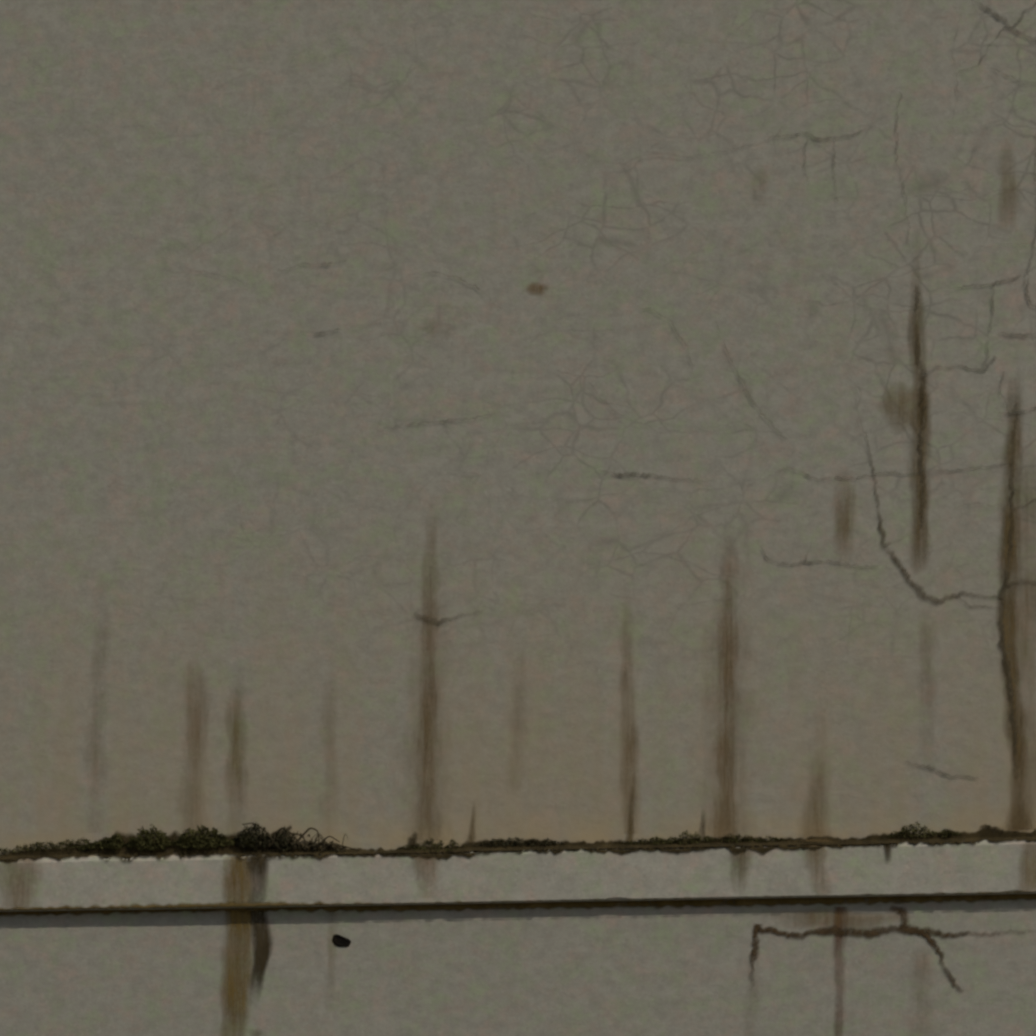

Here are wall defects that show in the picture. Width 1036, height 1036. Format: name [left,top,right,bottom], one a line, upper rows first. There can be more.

damp [913,313,928,554]
crack [916,342,926,479]
crack [878,518,955,603]
crack [1000,485,1014,597]
crack [999,622,1017,745]
damp [244,836,272,881]
crack [0,824,1036,863]
damp [252,910,270,984]
crack [751,907,968,989]